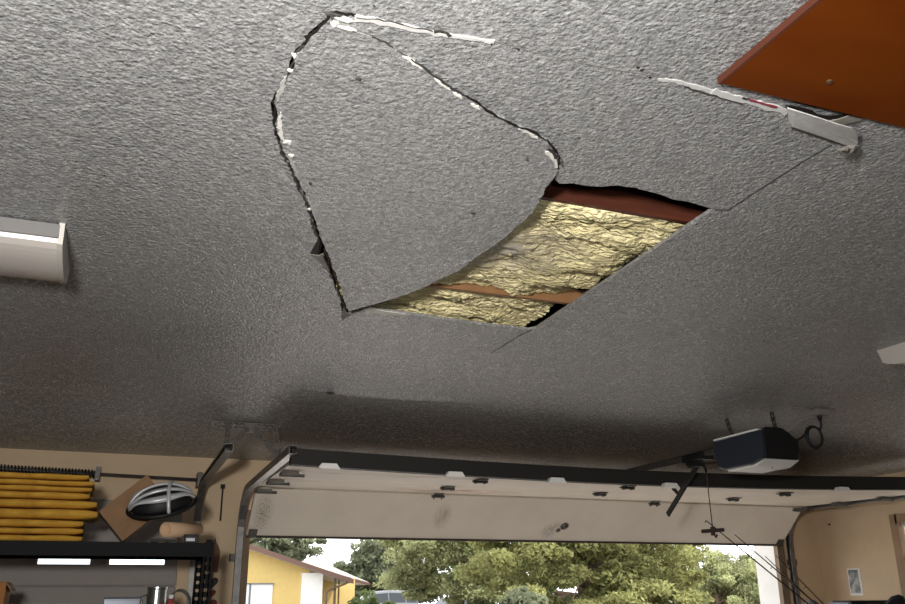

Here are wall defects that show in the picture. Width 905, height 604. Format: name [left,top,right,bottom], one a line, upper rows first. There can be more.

crack [495,41,665,79]
crack [272,11,561,311]
crack [728,145,832,210]